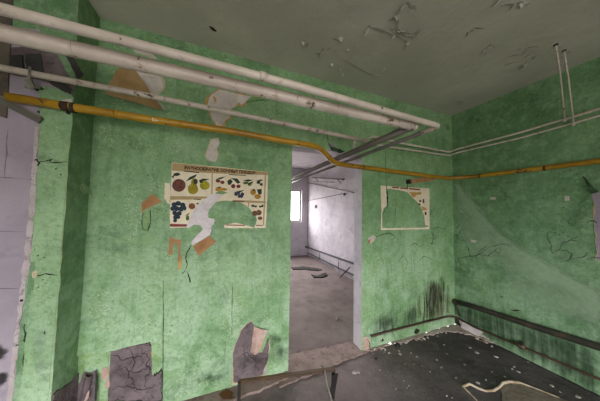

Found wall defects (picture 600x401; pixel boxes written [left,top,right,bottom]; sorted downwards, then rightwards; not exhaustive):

flaking render [6,127,40,401]
crack [546,231,588,262]
flaking render [51,342,163,401]
flaking render [232,321,270,385]